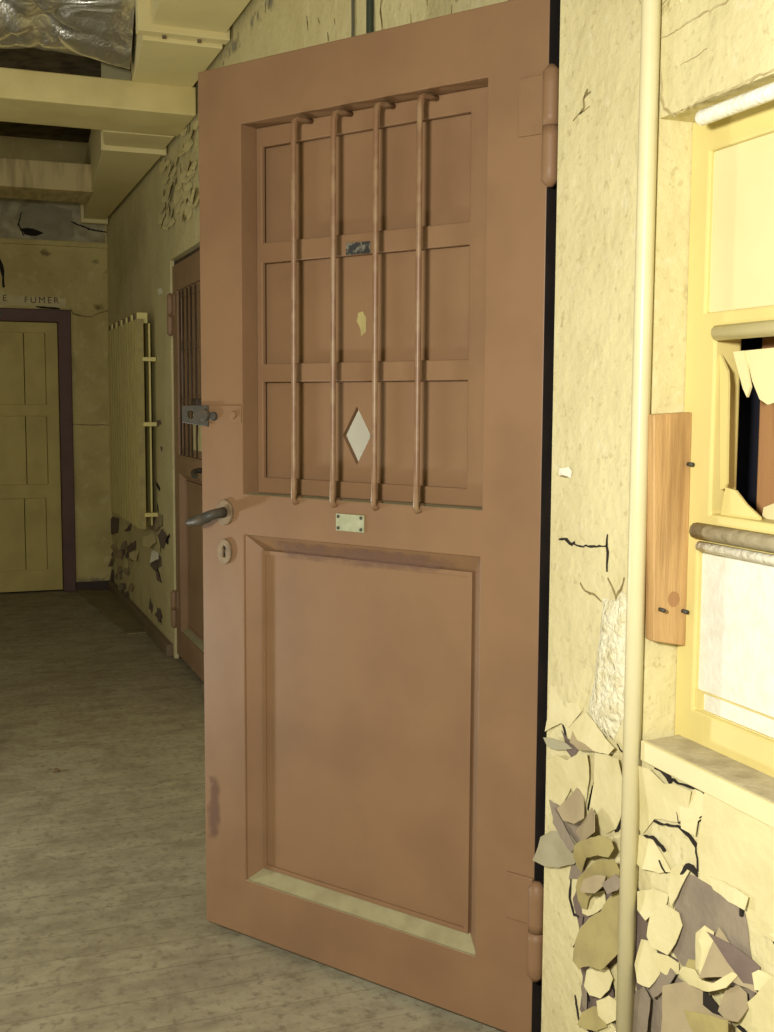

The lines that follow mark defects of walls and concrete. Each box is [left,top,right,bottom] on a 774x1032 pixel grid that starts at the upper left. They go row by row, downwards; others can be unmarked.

crack [660,0,729,40]
peeling [158,111,199,233]
crack [0,259,8,288]
peeling [108,483,170,597]
crack [559,534,625,602]
peeling [533,686,623,1032]
peeling [633,766,774,1032]